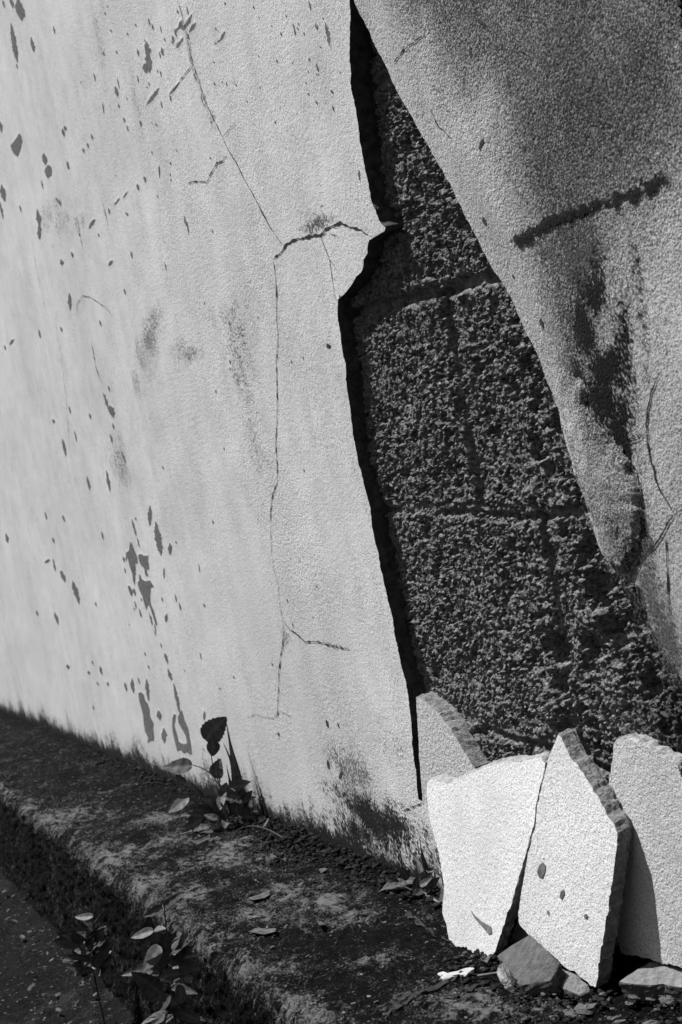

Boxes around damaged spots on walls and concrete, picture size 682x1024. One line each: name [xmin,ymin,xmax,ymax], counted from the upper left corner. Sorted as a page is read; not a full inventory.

crack [171,7,368,399]
peeling [271,12,336,51]
crack [248,425,348,719]
spalling [326,0,682,799]